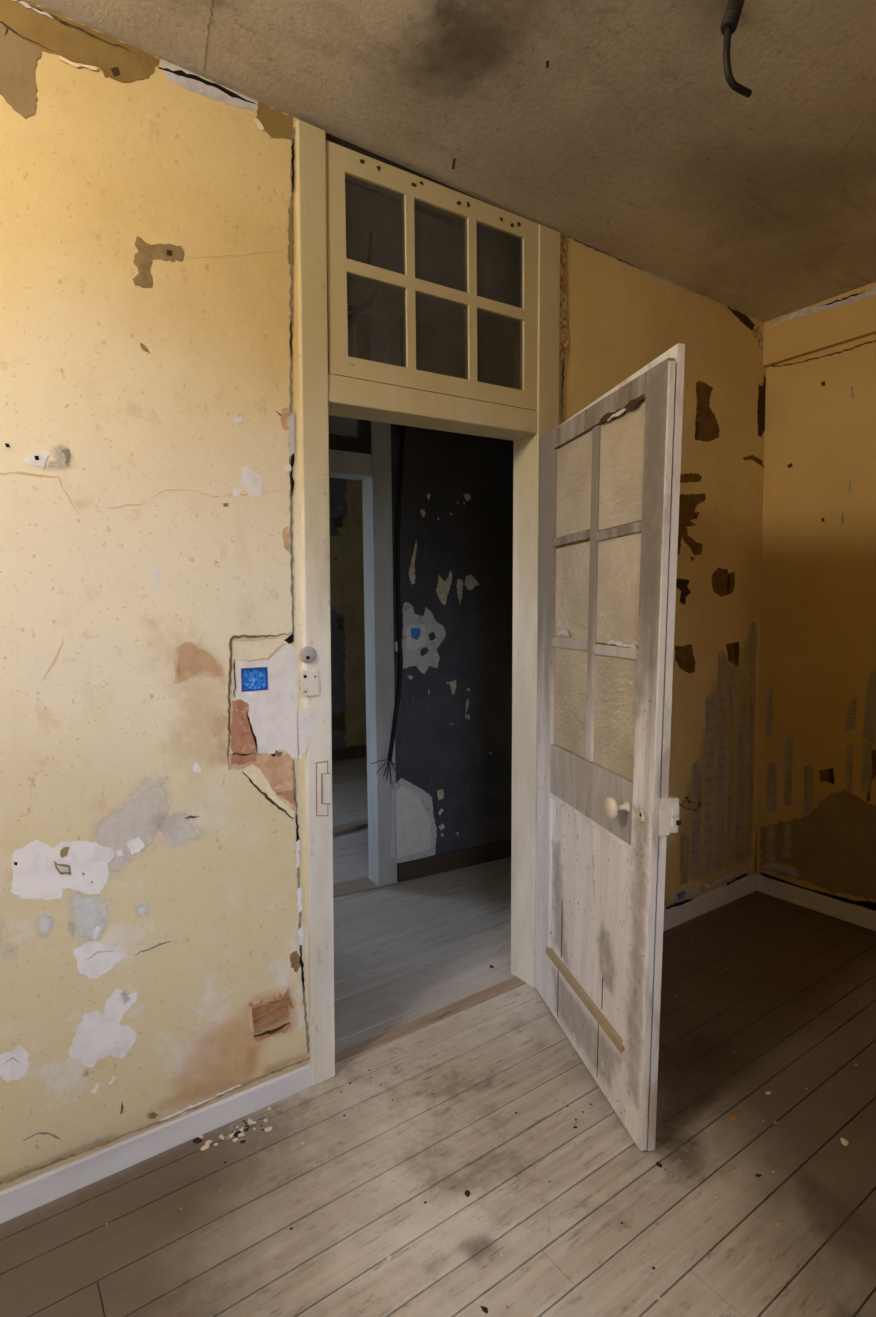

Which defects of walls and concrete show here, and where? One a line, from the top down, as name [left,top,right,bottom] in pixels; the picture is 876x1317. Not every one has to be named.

peeling [0,0,160,119]
peeling [133,236,184,288]
peeling [695,381,720,442]
crack [0,127,296,770]
peeling [677,473,706,561]
peeling [676,577,691,605]
peeling [712,567,735,597]
peeling [675,644,696,674]
peeling [726,642,739,667]
peeling [229,660,296,819]
peeling [54,847,71,875]
spalling [248,988,294,1042]